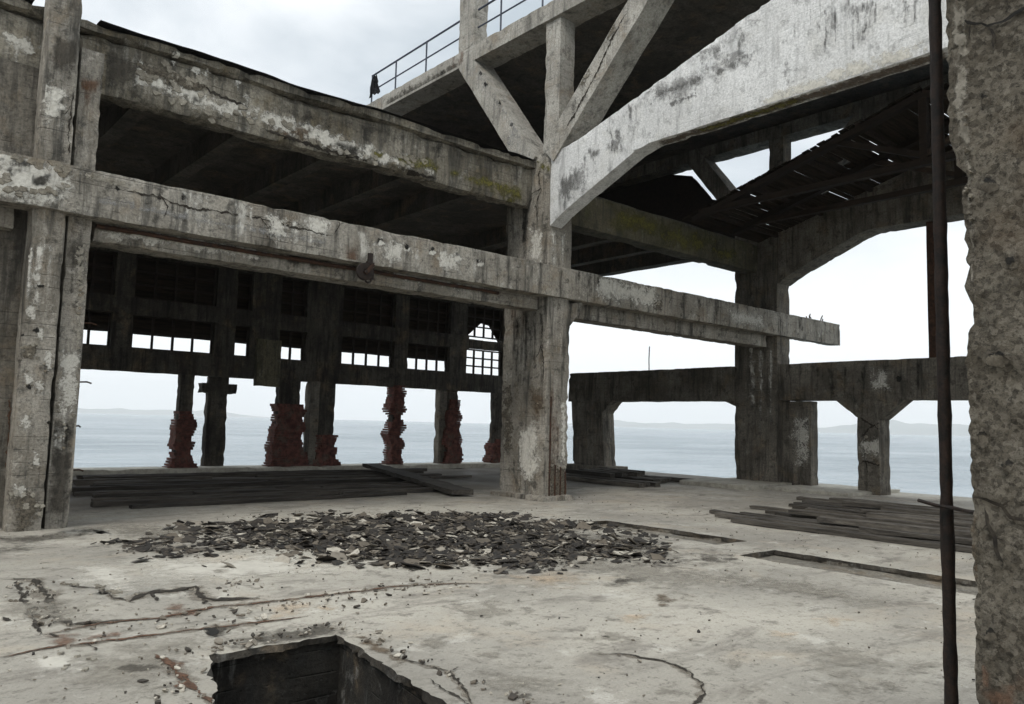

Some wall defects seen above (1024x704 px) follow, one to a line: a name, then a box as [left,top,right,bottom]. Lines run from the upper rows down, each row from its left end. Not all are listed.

peeling [134,59,434,174]
peeling [0,153,75,206]
crack [119,188,344,238]
spalling [530,385,568,496]
crack [0,578,482,704]
crack [598,652,706,704]